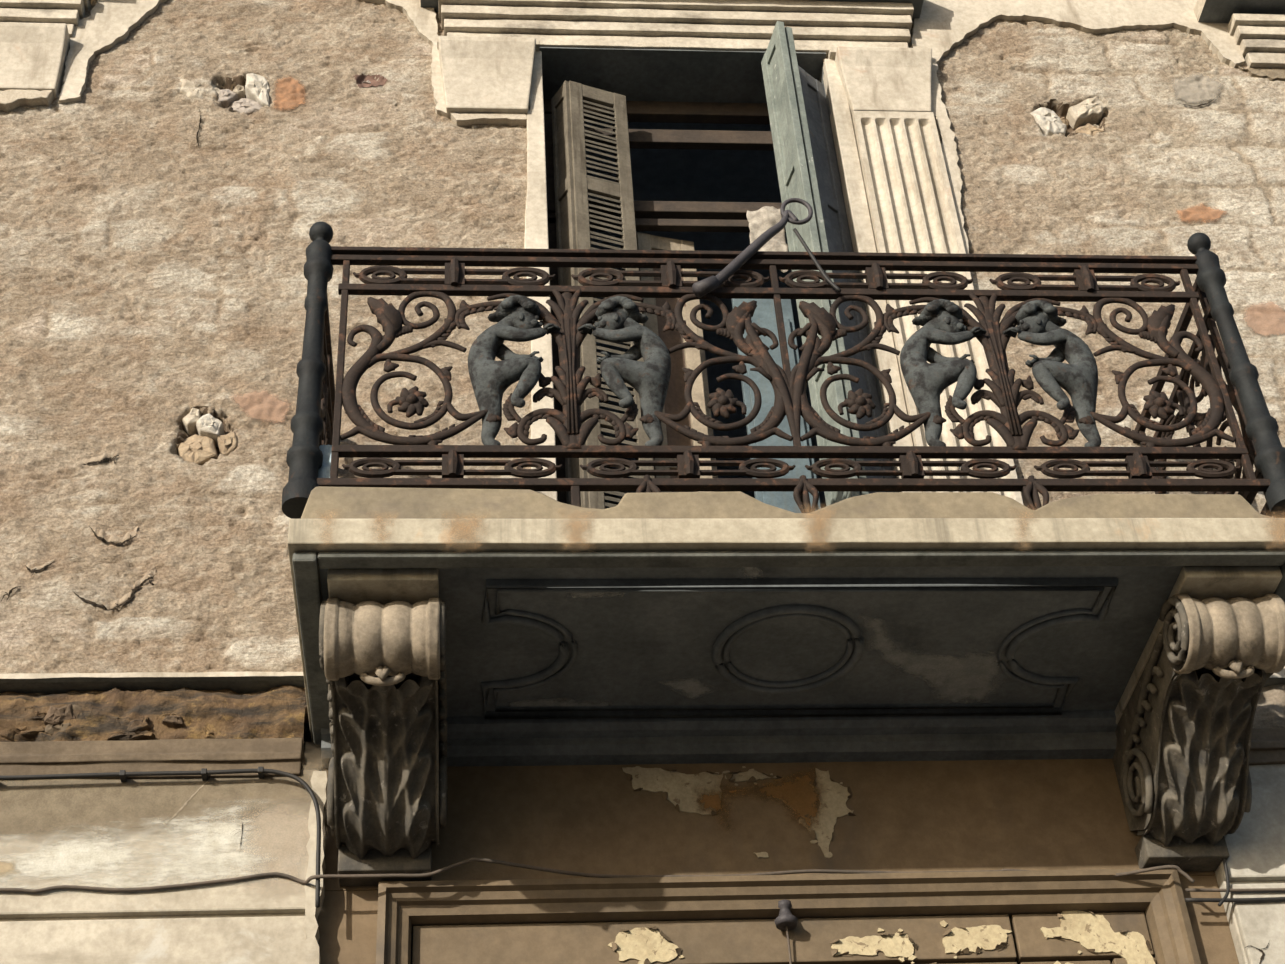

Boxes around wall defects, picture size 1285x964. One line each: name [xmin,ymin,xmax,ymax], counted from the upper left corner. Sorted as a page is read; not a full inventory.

spalling [180,73,305,115]
flaking render [450,112,527,127]
spalling [1030,97,1106,137]
spalling [175,406,238,465]
crack [90,522,138,545]
crack [1,559,55,602]
crack [74,570,156,610]
spalling [107,712,184,741]
peeling [622,766,783,816]
peeling [799,768,857,858]
peeling [830,920,1012,964]
peeling [1040,910,1155,964]